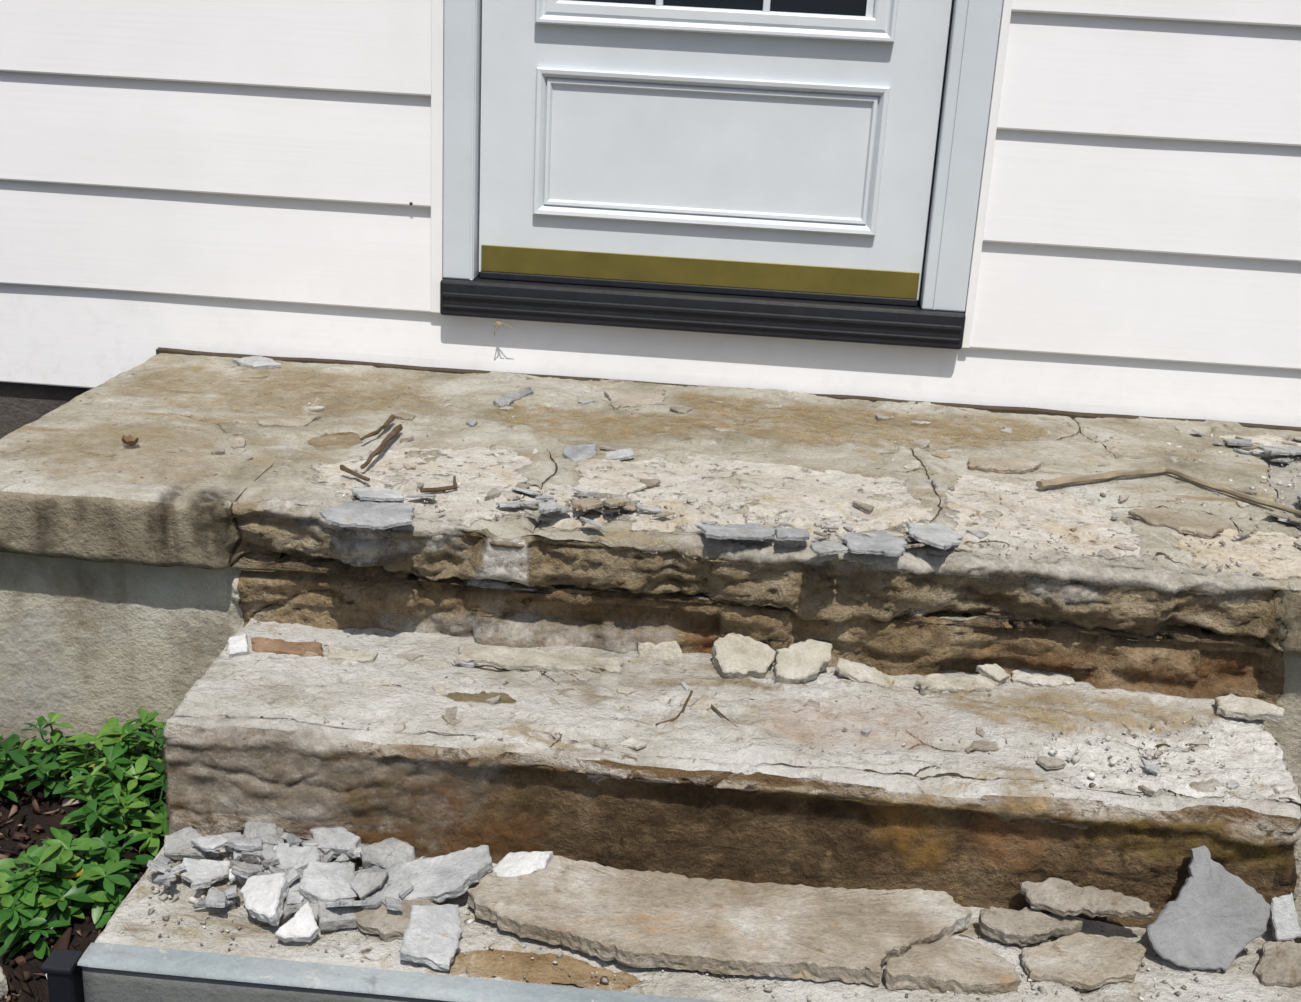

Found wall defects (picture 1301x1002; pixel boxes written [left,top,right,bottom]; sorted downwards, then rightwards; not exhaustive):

crack [875,449,943,523]
crack [1057,418,1117,458]
spalling [228,429,1301,705]
peeling [0,737,113,869]
spalling [118,716,1300,928]
peeling [0,879,114,1002]
spalling [448,949,646,990]